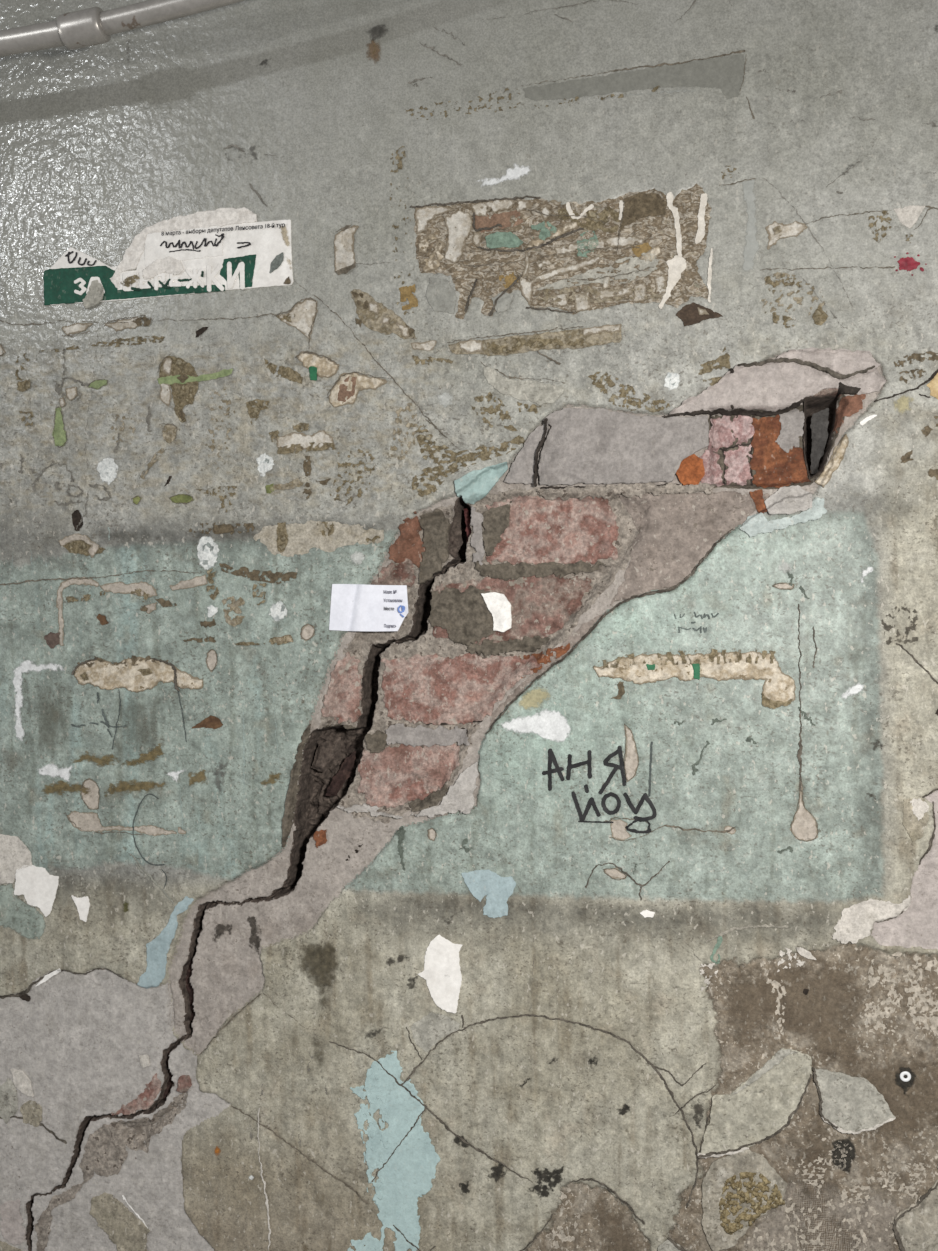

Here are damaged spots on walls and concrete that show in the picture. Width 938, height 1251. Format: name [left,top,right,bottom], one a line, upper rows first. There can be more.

crack [0,496,716,1251]
spalling [0,362,938,1251]
crack [533,418,548,487]
crack [874,369,938,402]